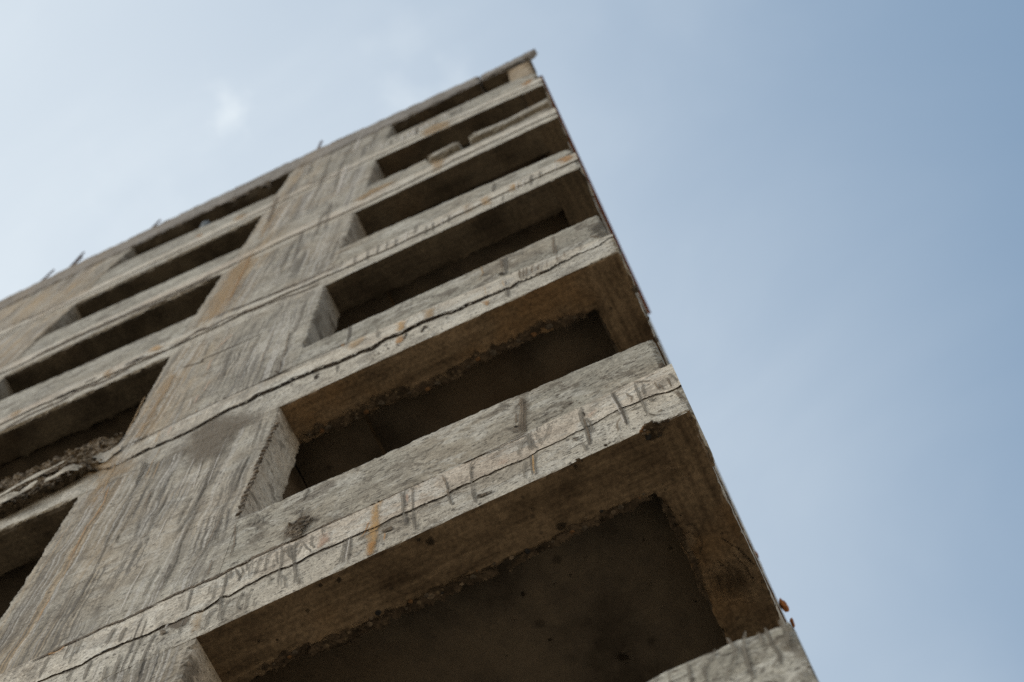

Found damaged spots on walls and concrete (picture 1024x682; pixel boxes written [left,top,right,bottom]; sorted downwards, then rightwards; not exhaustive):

spalling [0,432,125,519]
water stain [63,415,267,681]
crack [106,248,593,470]
crack [50,393,684,677]